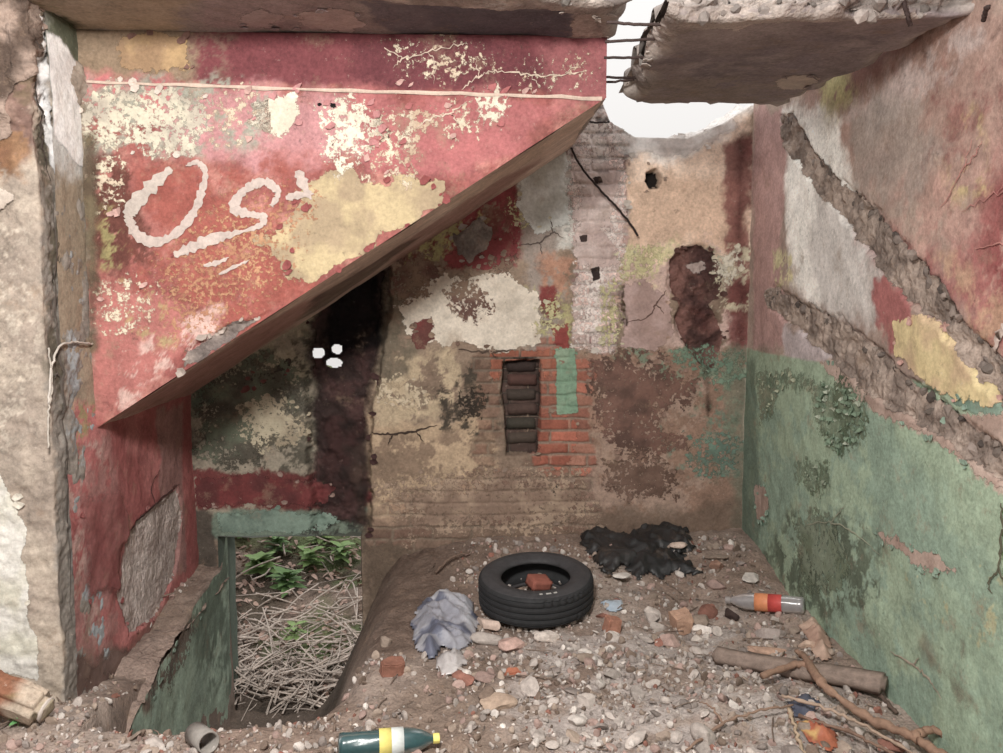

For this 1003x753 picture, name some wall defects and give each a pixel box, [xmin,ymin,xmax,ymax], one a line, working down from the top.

peeling [80,0,930,378]
crack [520,221,563,254]
crack [629,290,667,322]
spalling [393,103,1003,534]
crack [372,425,437,444]
spalling [0,476,39,681]
spalling [117,489,182,633]
water stain [792,502,851,605]
spalling [872,530,956,578]